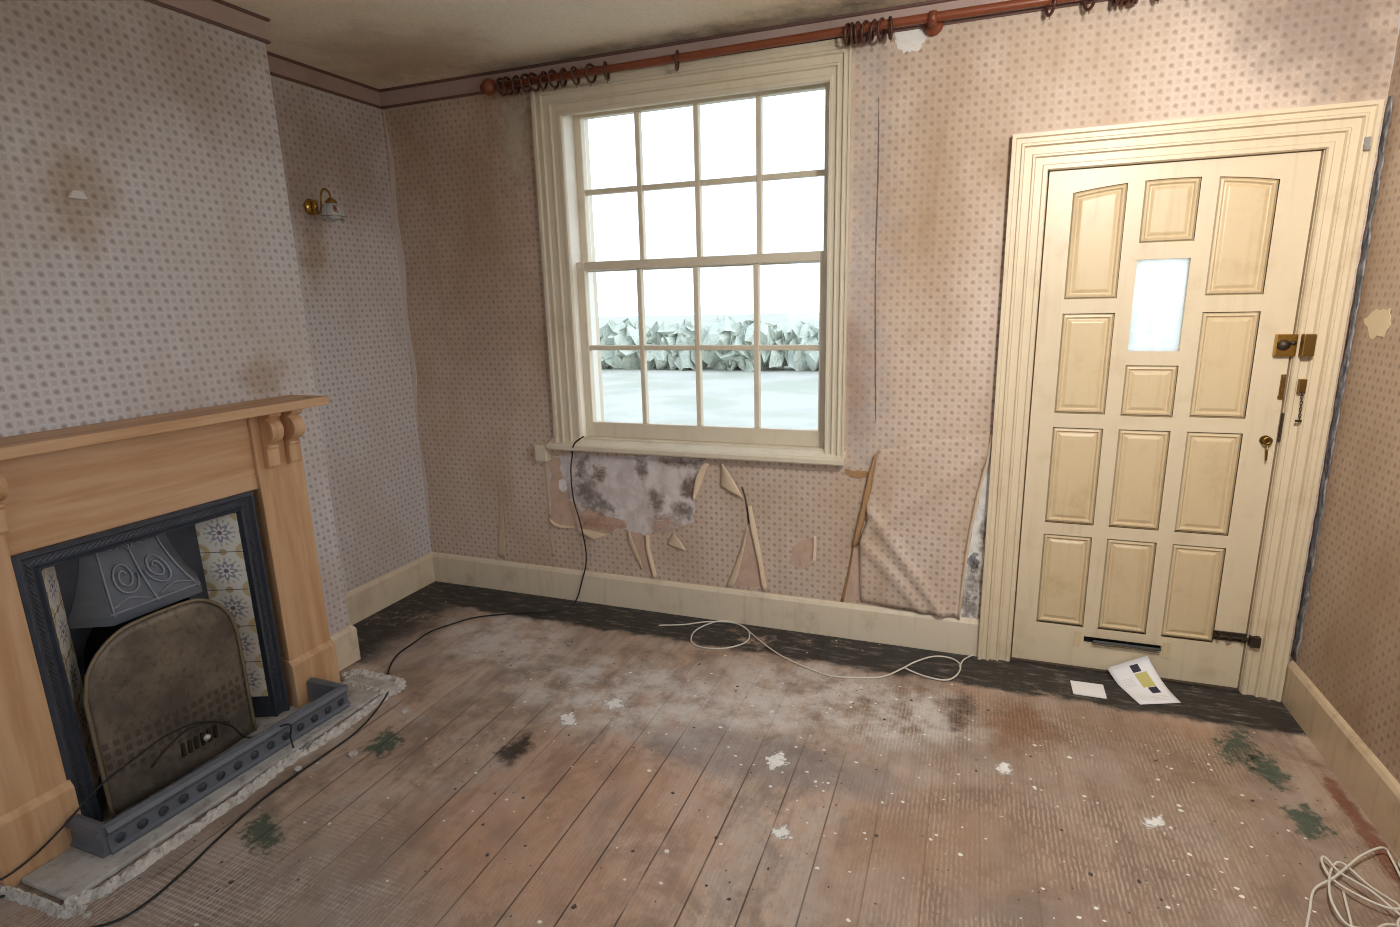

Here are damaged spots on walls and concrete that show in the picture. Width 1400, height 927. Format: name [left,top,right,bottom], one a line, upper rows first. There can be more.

peeling [543,453,743,550]